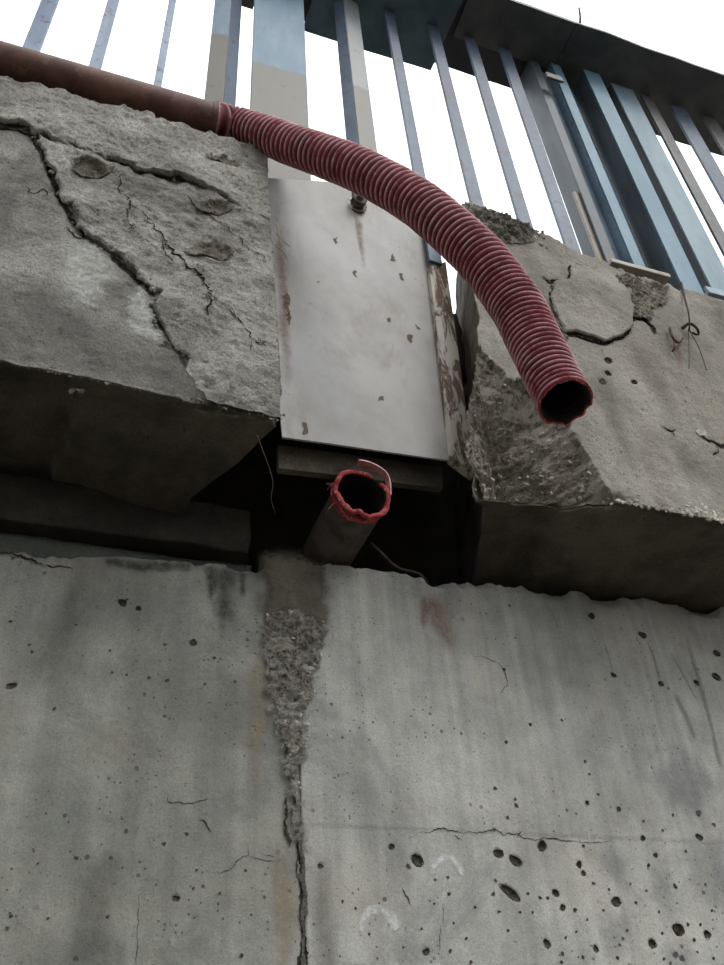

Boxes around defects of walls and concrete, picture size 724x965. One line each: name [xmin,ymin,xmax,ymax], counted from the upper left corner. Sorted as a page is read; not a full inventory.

crack [0,126,190,366]
crack [117,173,269,351]
spalling [467,205,538,244]
peeling [550,263,669,342]
spalling [464,344,593,506]
crack [0,552,74,570]
crack [213,745,309,965]
spalling [260,607,328,965]
crack [412,827,608,843]